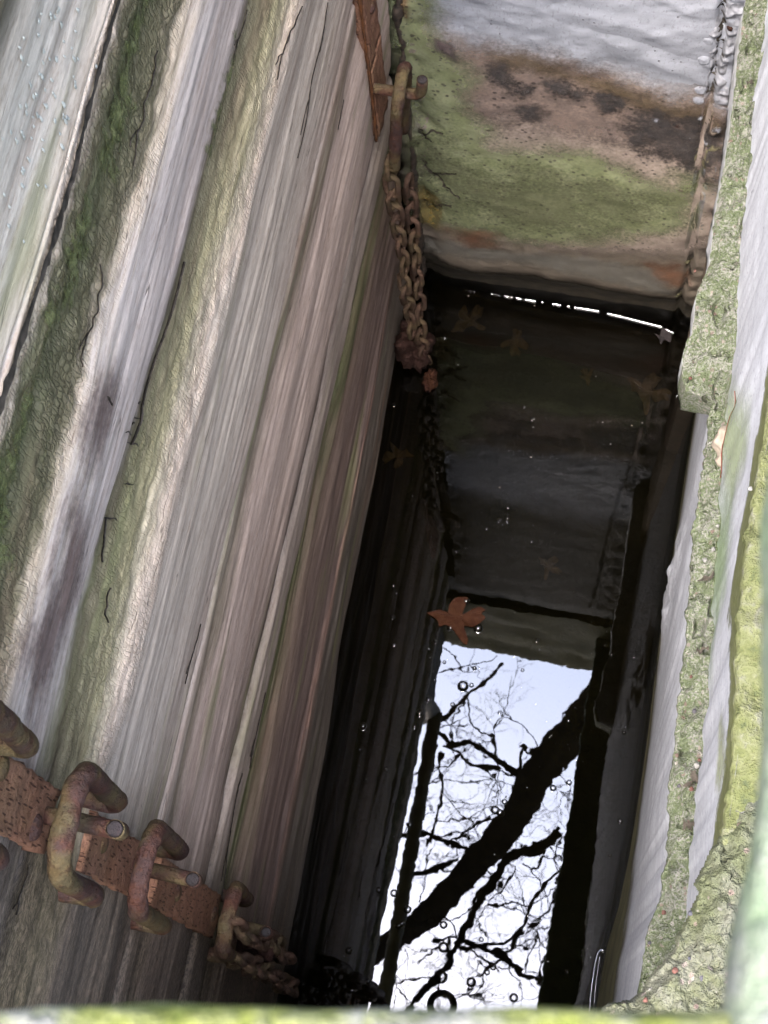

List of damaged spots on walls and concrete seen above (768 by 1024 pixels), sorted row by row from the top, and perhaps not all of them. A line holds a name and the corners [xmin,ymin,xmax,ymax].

crack [0,0,121,416]
crack [129,50,159,166]
crack [275,2,328,158]
corrosion [357,0,378,142]
damp [407,23,727,255]
crack [130,262,186,445]
crack [100,517,108,562]